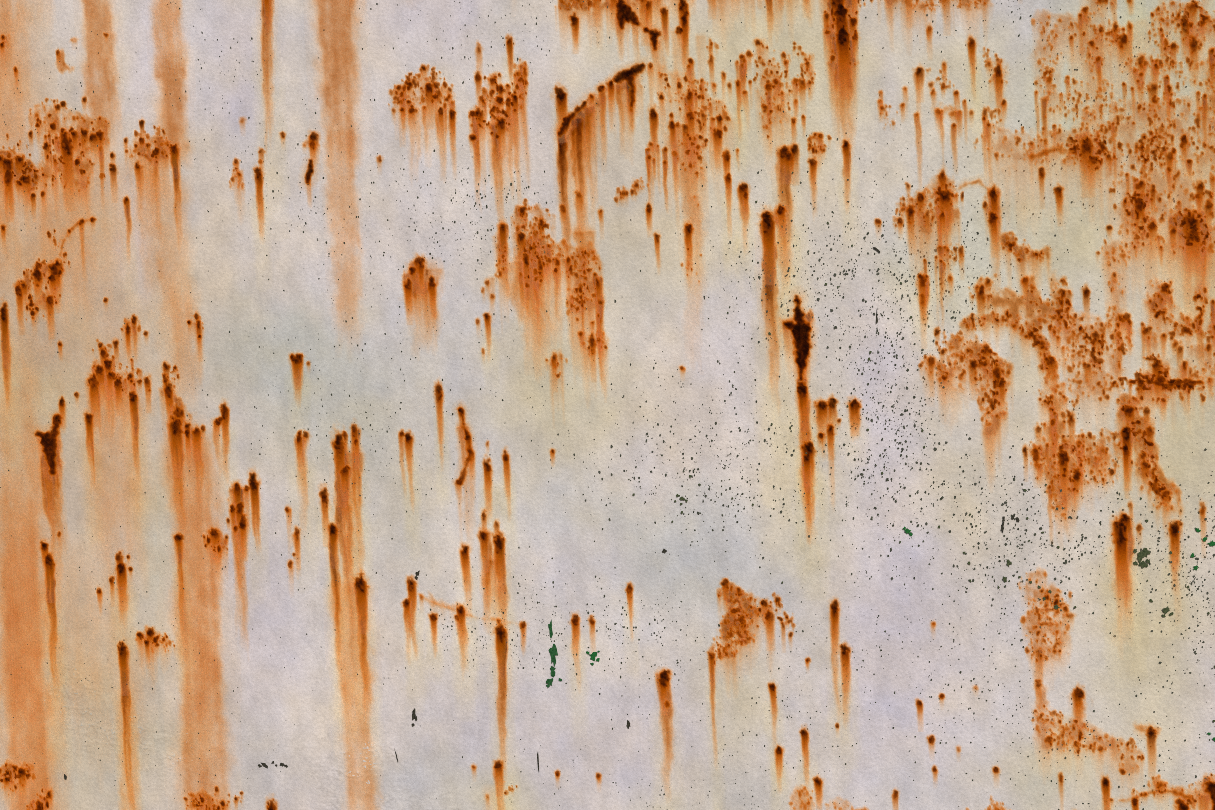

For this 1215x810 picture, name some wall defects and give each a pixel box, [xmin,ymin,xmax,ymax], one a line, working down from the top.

corrosion [0,0,183,205]
corrosion [390,36,528,165]
corrosion [559,0,689,42]
corrosion [614,39,815,214]
corrosion [476,191,607,354]
corrosion [760,133,861,502]
corrosion [918,0,1215,557]
corrosion [35,313,229,640]
corrosion [197,472,260,595]
corrosion [319,424,368,661]
corrosion [708,578,795,698]
corrosion [1032,679,1157,810]